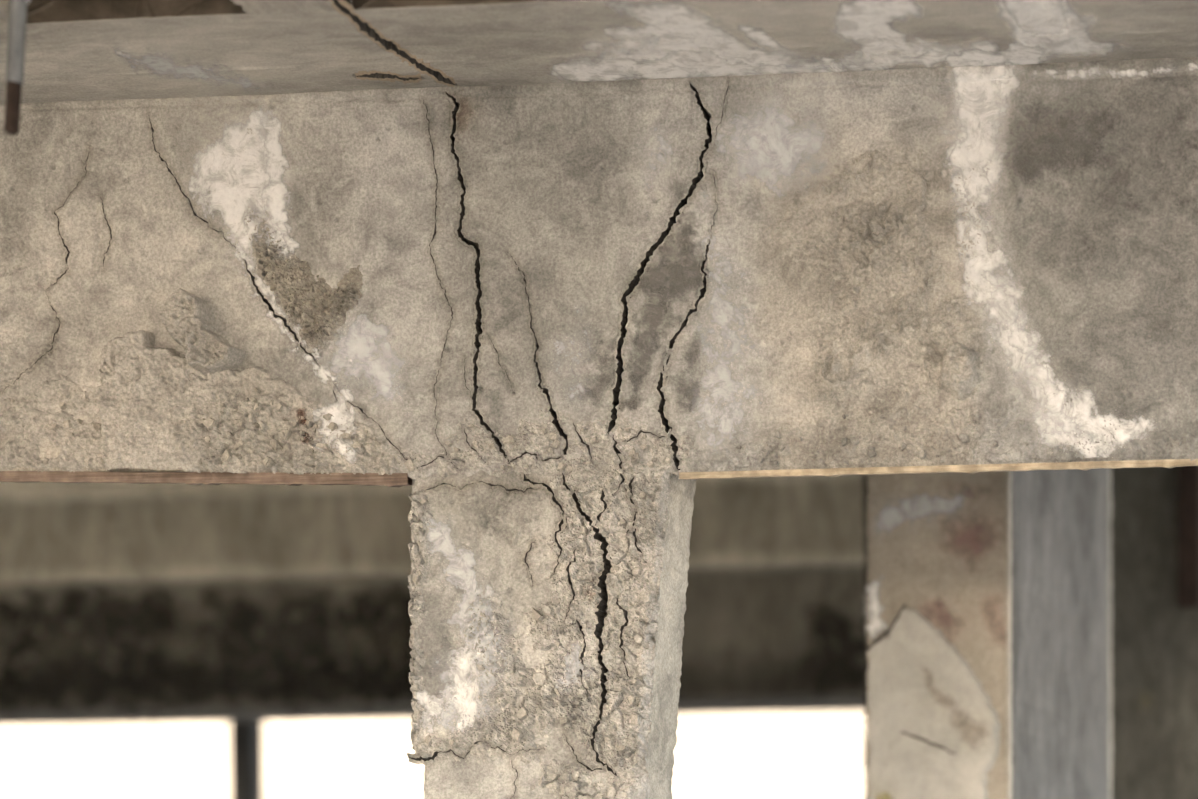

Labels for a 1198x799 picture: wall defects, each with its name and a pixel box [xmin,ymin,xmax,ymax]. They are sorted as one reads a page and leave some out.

crack [0,146,114,392]
leakage [189,111,403,462]
crack [147,0,731,799]
leakage [552,0,1170,458]
spalling [395,400,1198,799]